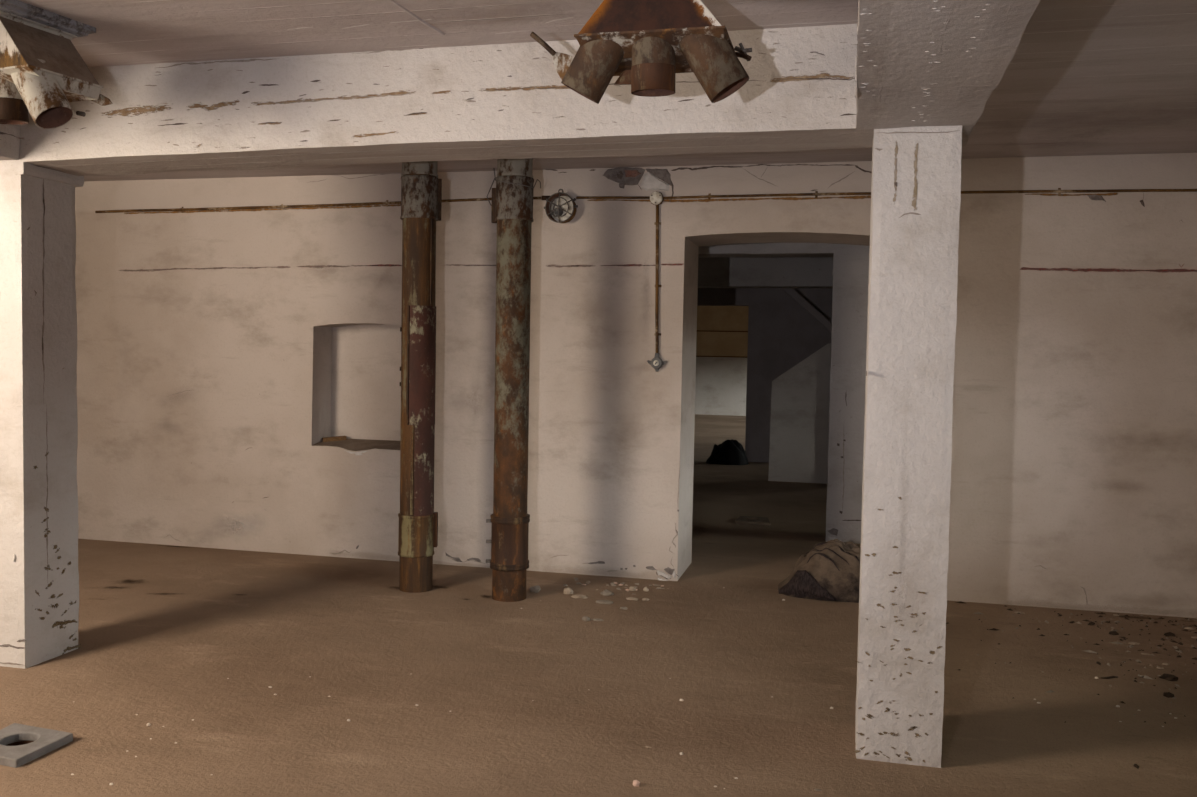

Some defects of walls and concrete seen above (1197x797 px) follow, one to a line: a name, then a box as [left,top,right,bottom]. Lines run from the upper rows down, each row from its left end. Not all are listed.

corrosion [102,91,411,126]
corrosion [748,73,855,82]
crack [671,130,960,225]
spalling [35,507,81,655]
spalling [856,571,942,681]
spalling [854,700,933,763]